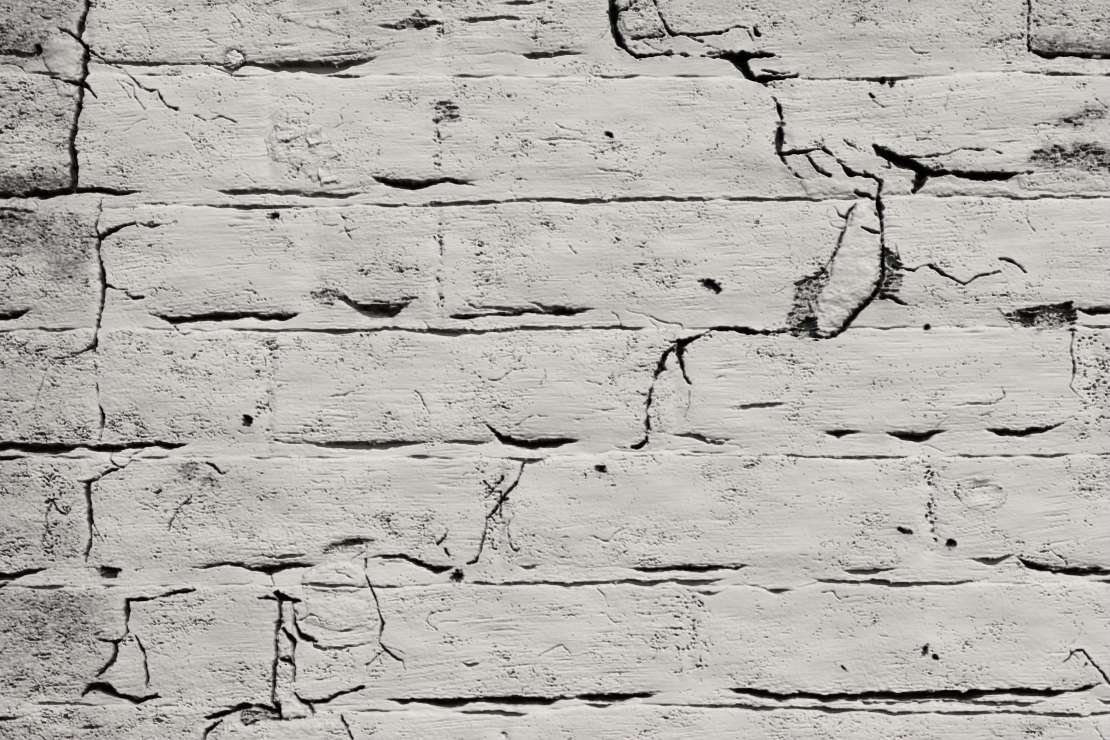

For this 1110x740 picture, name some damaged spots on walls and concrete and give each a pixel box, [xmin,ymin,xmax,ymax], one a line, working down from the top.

crack [50,0,177,192]
crack [72,205,159,357]
crack [608,0,1031,450]
crack [97,387,105,428]
crack [46,460,119,563]
crack [437,463,525,565]
crack [82,590,195,704]
crack [204,591,364,740]